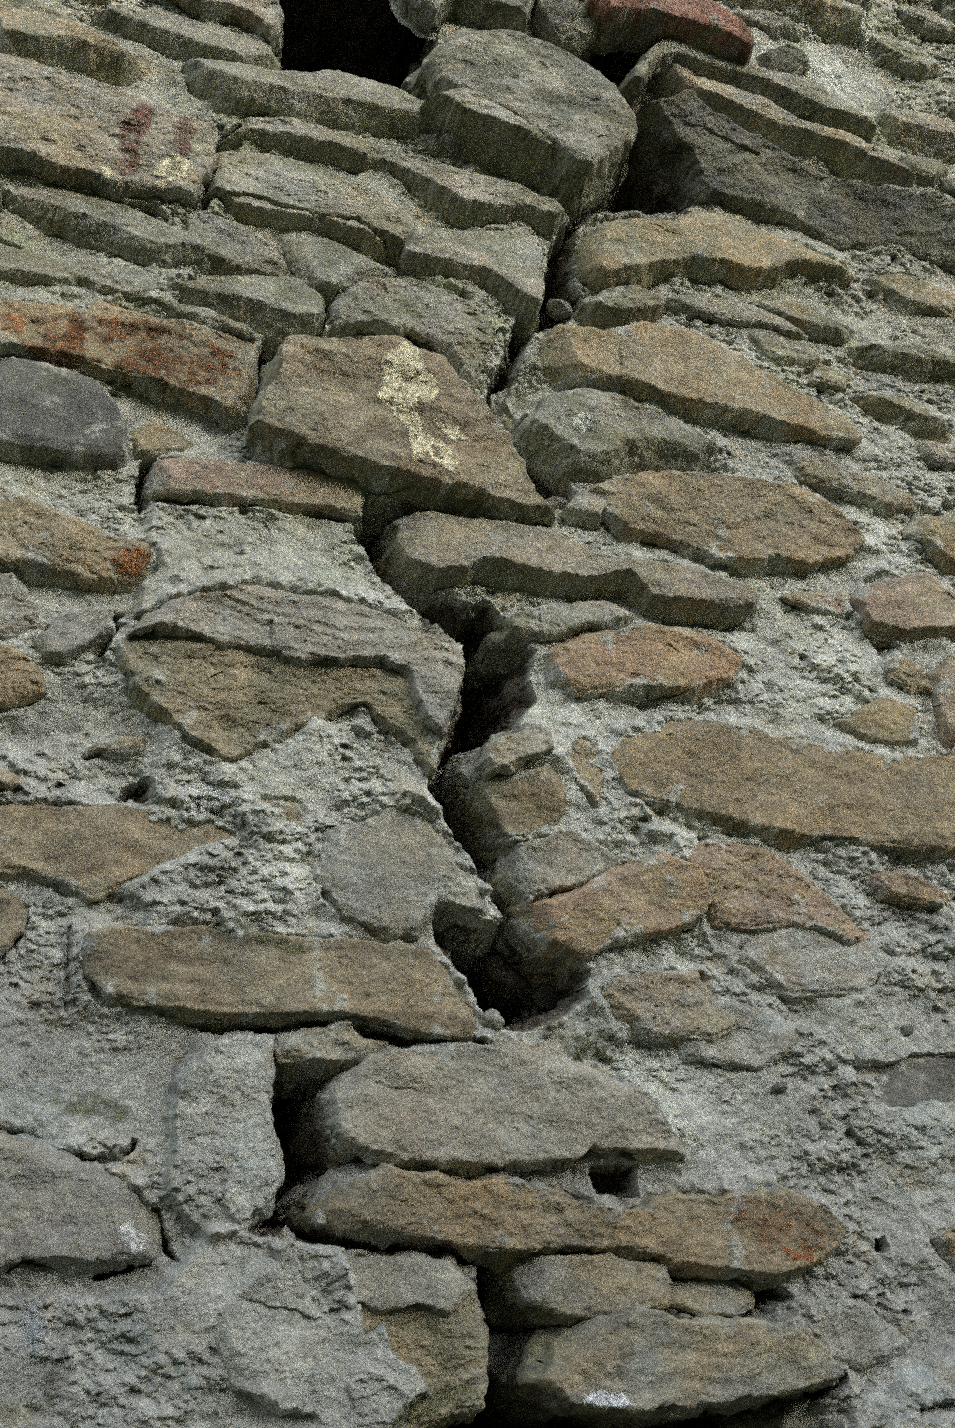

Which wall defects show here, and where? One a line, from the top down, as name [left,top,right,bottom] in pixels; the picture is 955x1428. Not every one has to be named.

crack [592,50,643,87]
crack [483,166,696,430]
crack [533,479,579,514]
crack [352,526,538,793]
crack [423,829,601,1045]
crack [182,1020,396,1255]
crack [435,1244,489,1266]